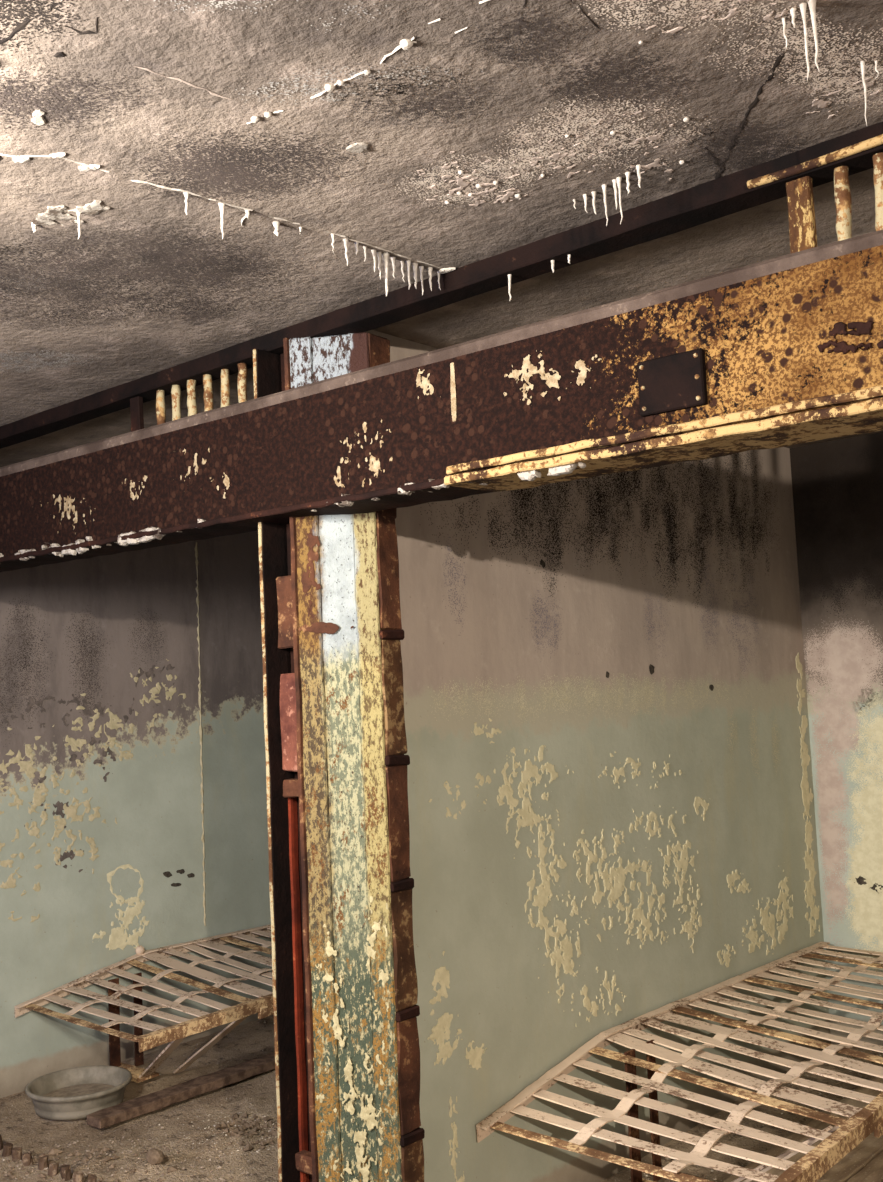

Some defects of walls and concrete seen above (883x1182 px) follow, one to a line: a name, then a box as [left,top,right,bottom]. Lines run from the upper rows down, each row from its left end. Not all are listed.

damp [0,0,168,135]
damp [78,0,883,211]
crack [705,53,785,179]
damp [0,200,327,331]
corrosion [817,320,883,354]
corrosion [517,462,586,481]
corrosion [0,527,181,564]
corrosion [297,533,354,634]
damp [420,450,792,682]
peeling [0,659,186,896]
peeling [717,652,820,967]
peeling [444,745,710,1027]